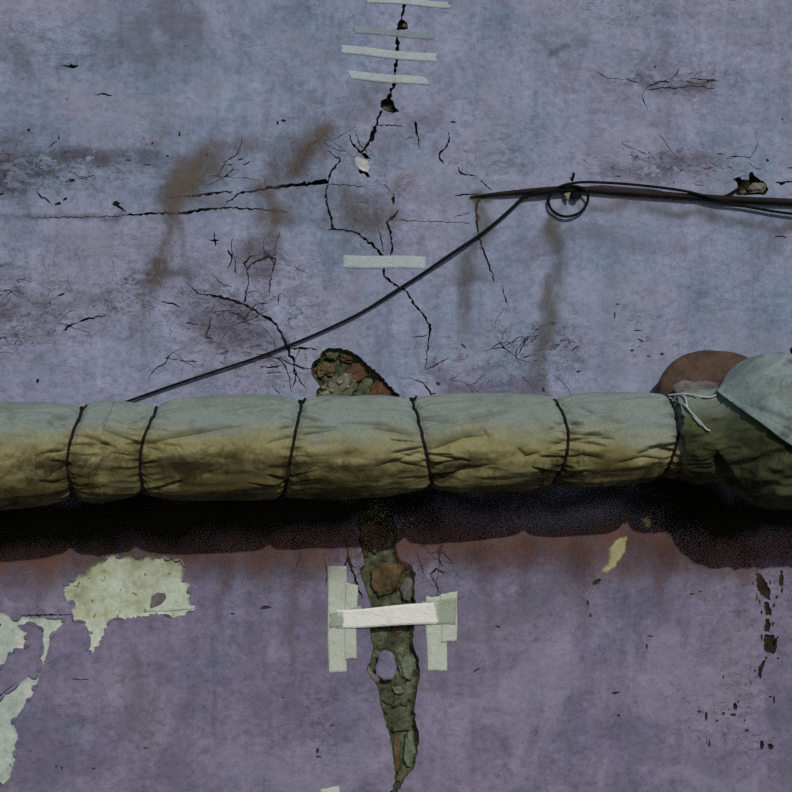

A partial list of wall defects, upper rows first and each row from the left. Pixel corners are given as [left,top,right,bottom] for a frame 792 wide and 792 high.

crack [597,69,717,110]
crack [31,4,542,395]
spalling [733,171,768,196]
spalling [311,348,400,397]
spalling [356,498,416,608]
peeling [592,536,627,585]
peeling [0,553,195,786]
spalling [367,625,420,792]
spalling [752,565,784,679]